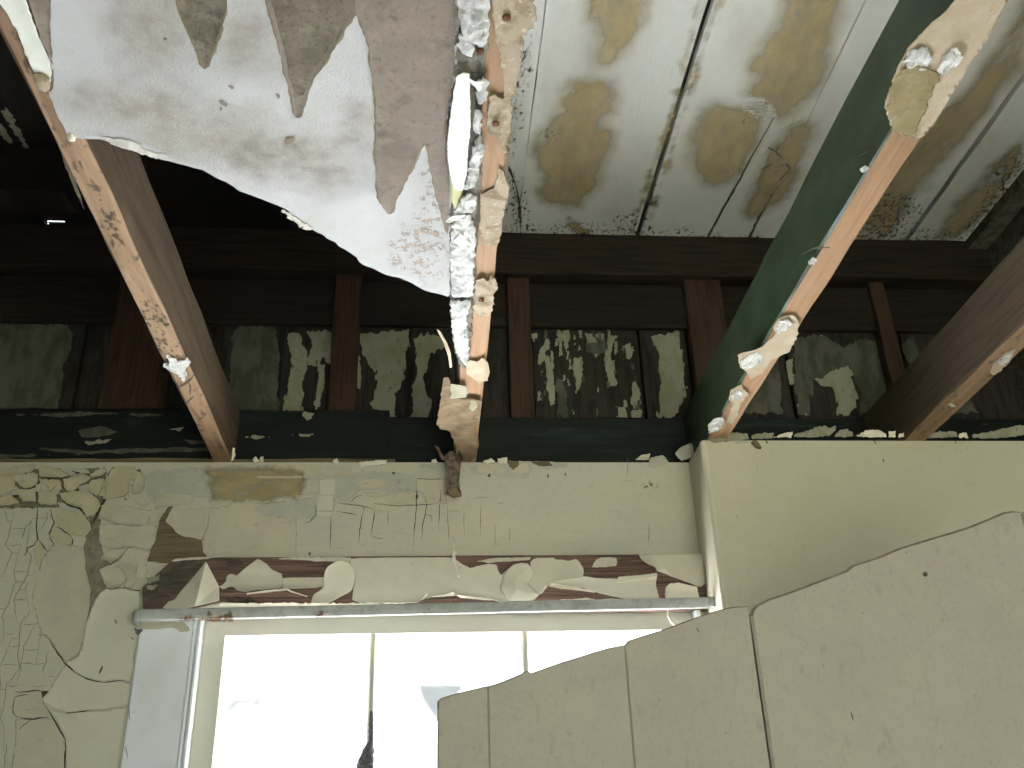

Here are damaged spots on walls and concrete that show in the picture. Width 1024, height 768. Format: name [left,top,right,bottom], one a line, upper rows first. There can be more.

spalling [102,137,168,159]
peeling [445,72,484,223]
mould [508,48,533,156]
water stain [538,82,614,205]
water stain [692,0,838,184]
water stain [858,12,1024,241]
spalling [281,210,312,230]
peeling [709,334,904,449]
water stain [207,469,304,501]
peeling [0,324,705,768]
crack [330,478,501,548]
crack [0,467,157,768]